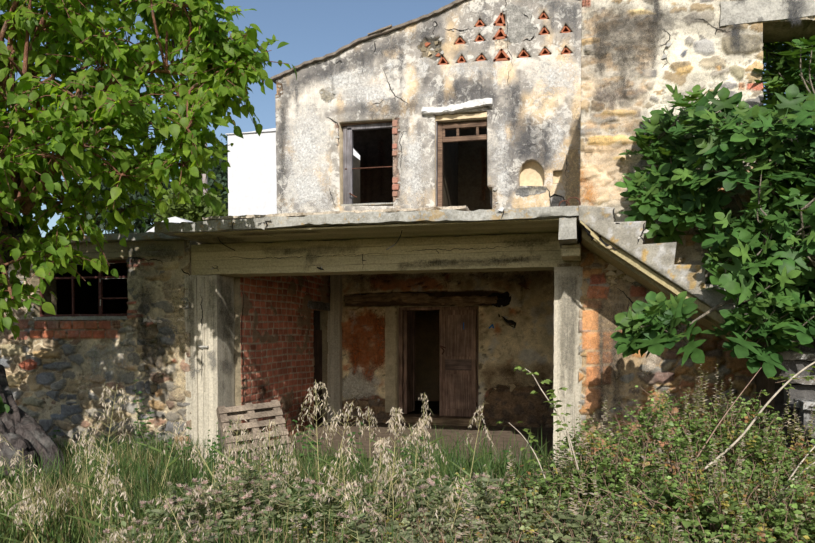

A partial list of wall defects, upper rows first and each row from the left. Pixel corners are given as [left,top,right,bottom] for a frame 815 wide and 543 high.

crack [374,41,408,106]
flaking render [418,35,444,77]
leakage [593,0,659,104]
crack [259,216,271,230]
crack [133,257,203,328]
crack [210,244,537,295]